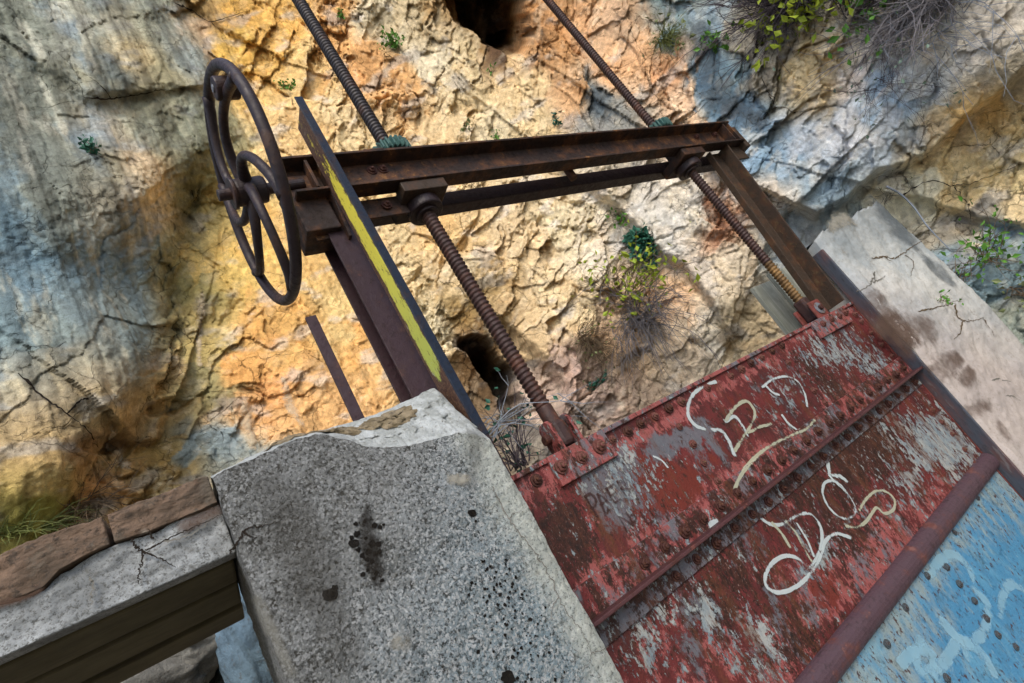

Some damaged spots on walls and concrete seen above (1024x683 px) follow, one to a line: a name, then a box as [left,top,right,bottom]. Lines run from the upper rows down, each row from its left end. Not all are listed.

crack [857,241,922,291]
rust [875,295,932,344]
crack [919,304,993,339]
crack [131,515,219,584]
leakage [360,506,383,586]